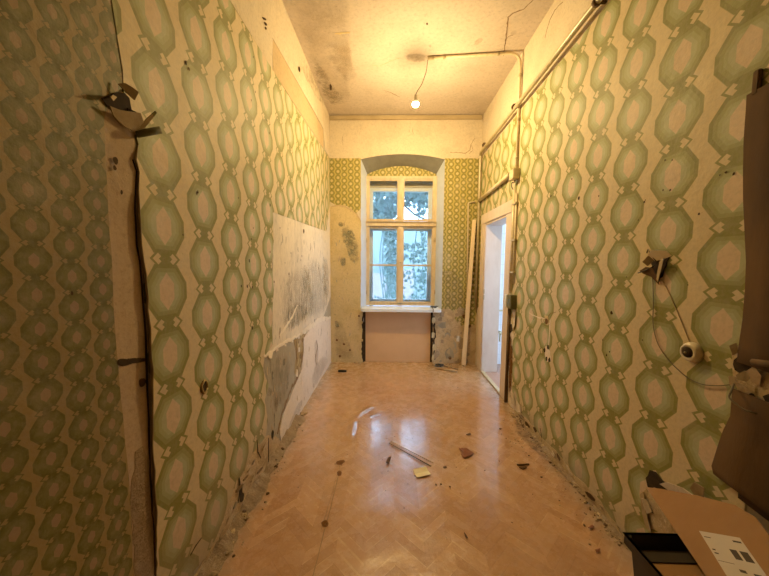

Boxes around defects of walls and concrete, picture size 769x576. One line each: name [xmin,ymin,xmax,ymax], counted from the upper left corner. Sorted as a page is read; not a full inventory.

crack [503,0,533,56]
flaking render [431,307,477,364]
flaking render [195,205,365,576]